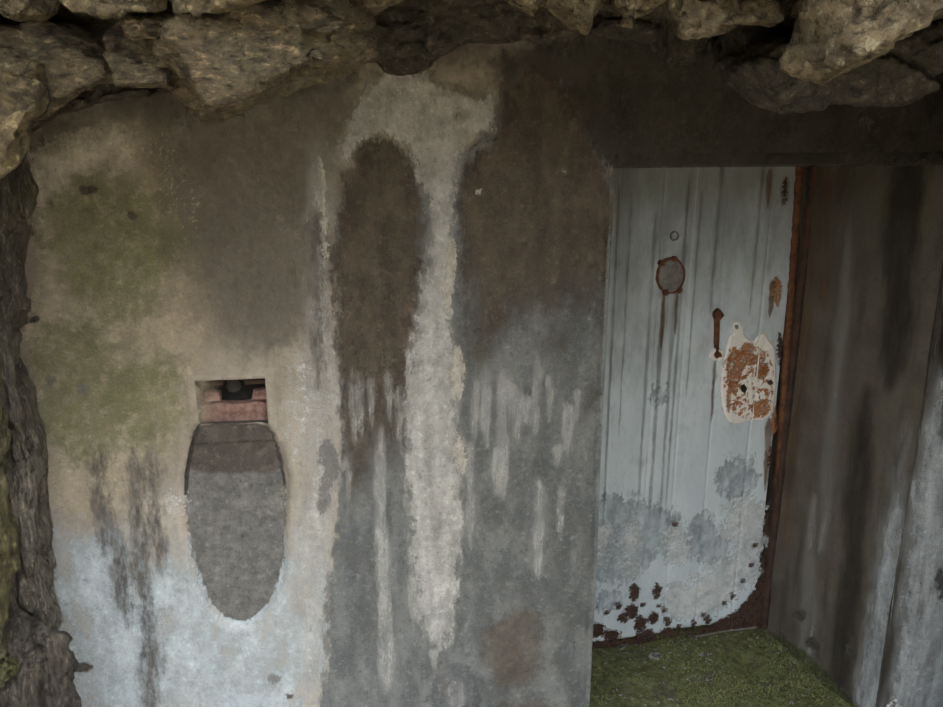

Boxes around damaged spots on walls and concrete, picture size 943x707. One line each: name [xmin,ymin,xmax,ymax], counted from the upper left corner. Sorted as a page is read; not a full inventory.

leakage [21,81,347,520]
leakage [301,30,943,707]
rust [660,287,683,346]
rust [711,167,804,487]
leakage [114,544,133,614]
leakage [130,503,158,707]
leakage [151,499,167,566]